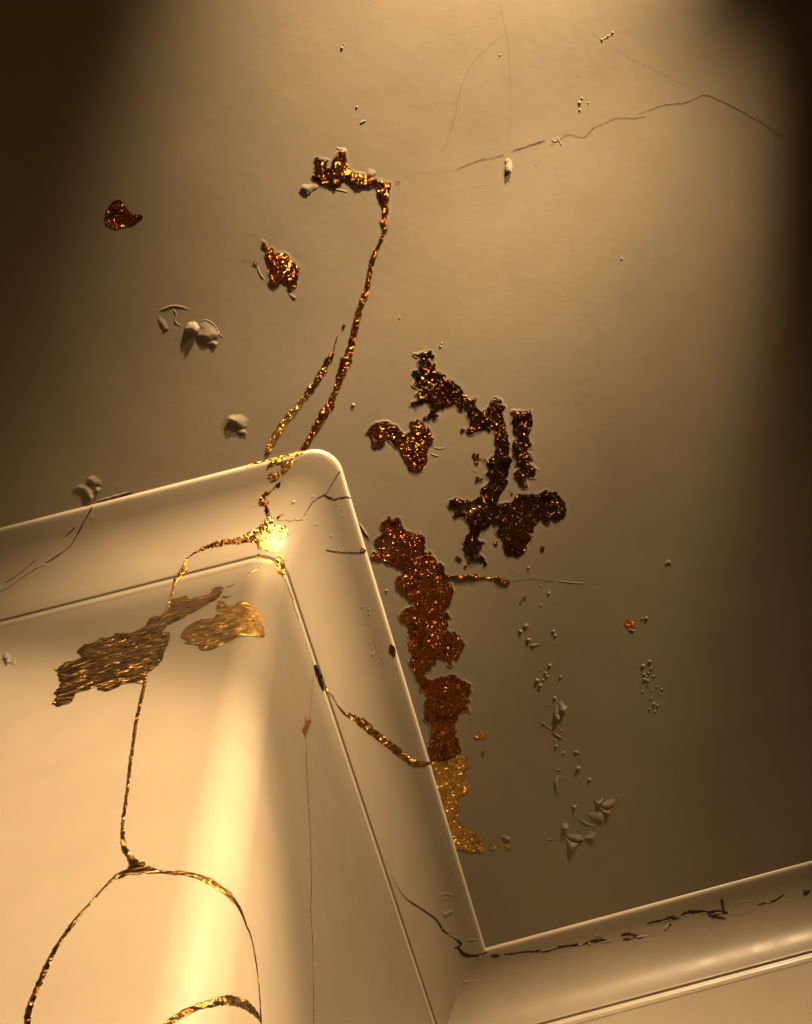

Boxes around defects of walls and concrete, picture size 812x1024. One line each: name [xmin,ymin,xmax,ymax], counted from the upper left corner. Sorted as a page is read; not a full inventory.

crack [458,95,783,169]
peeling [157,305,226,345]
peeling [225,414,249,437]
crack [164,228,388,618]
peeling [75,476,102,500]
crack [0,492,133,593]
crack [446,574,589,585]
crack [24,680,262,1024]
crack [302,665,431,1015]
peeling [543,795,619,852]
crack [391,875,790,960]